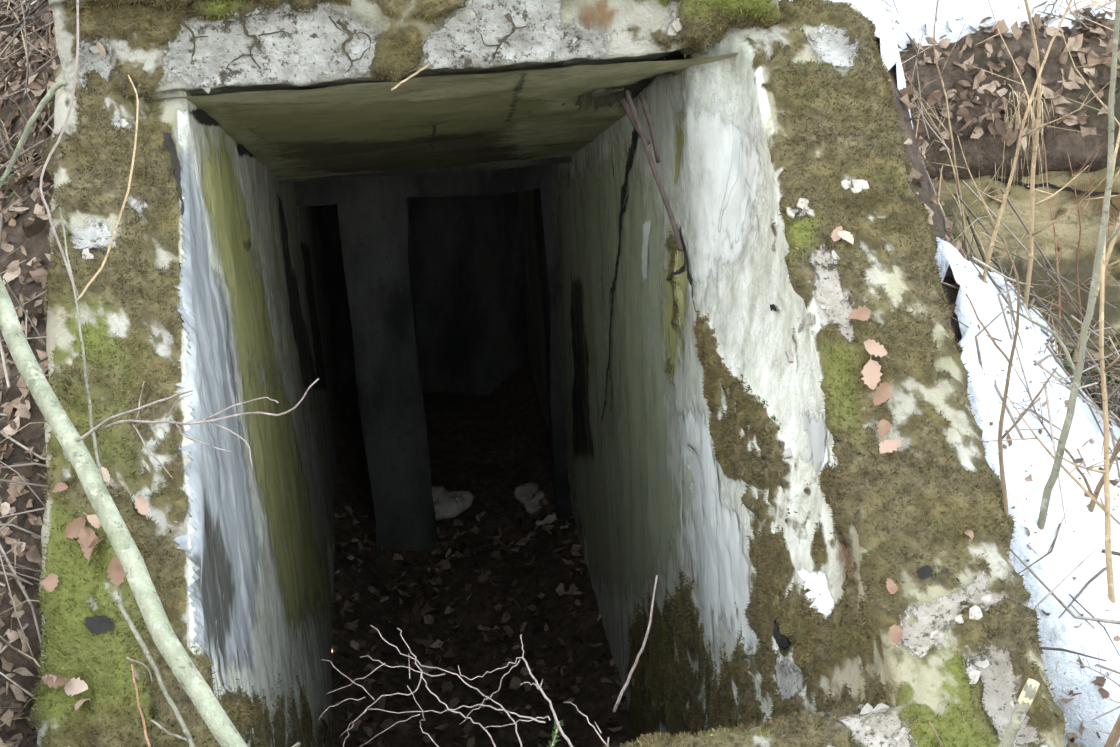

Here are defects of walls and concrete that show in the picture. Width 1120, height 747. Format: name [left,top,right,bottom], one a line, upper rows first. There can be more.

crack [179,19,208,62]
crack [226,18,290,69]
crack [328,16,372,74]
crack [479,13,527,64]
crack [600,129,637,457]